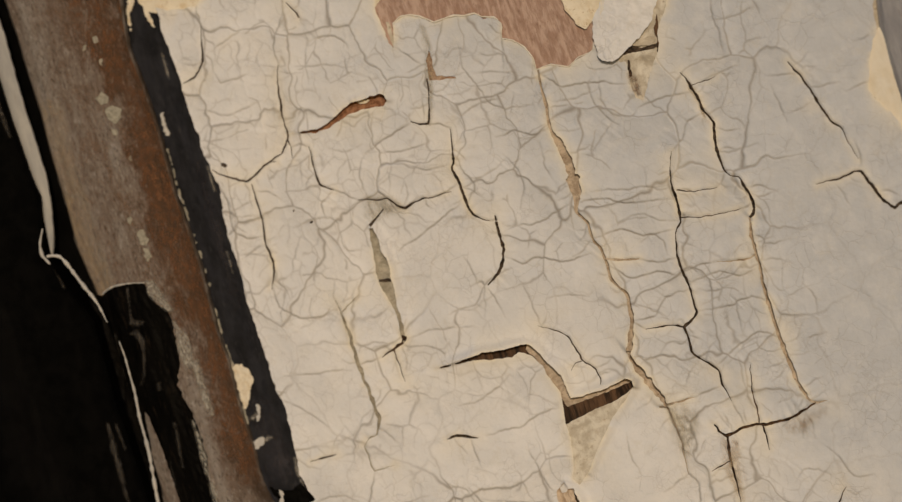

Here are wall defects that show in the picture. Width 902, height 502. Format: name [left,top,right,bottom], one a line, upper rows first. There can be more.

crack [184,38,204,83]
crack [212,68,333,285]
peeling [300,94,387,134]
crack [361,78,505,285]
peeling [375,0,666,100]
crack [787,61,902,209]
peeling [369,228,406,343]
crack [440,70,827,500]
crack [335,296,394,471]
crack [383,335,407,380]
peeling [557,378,690,502]